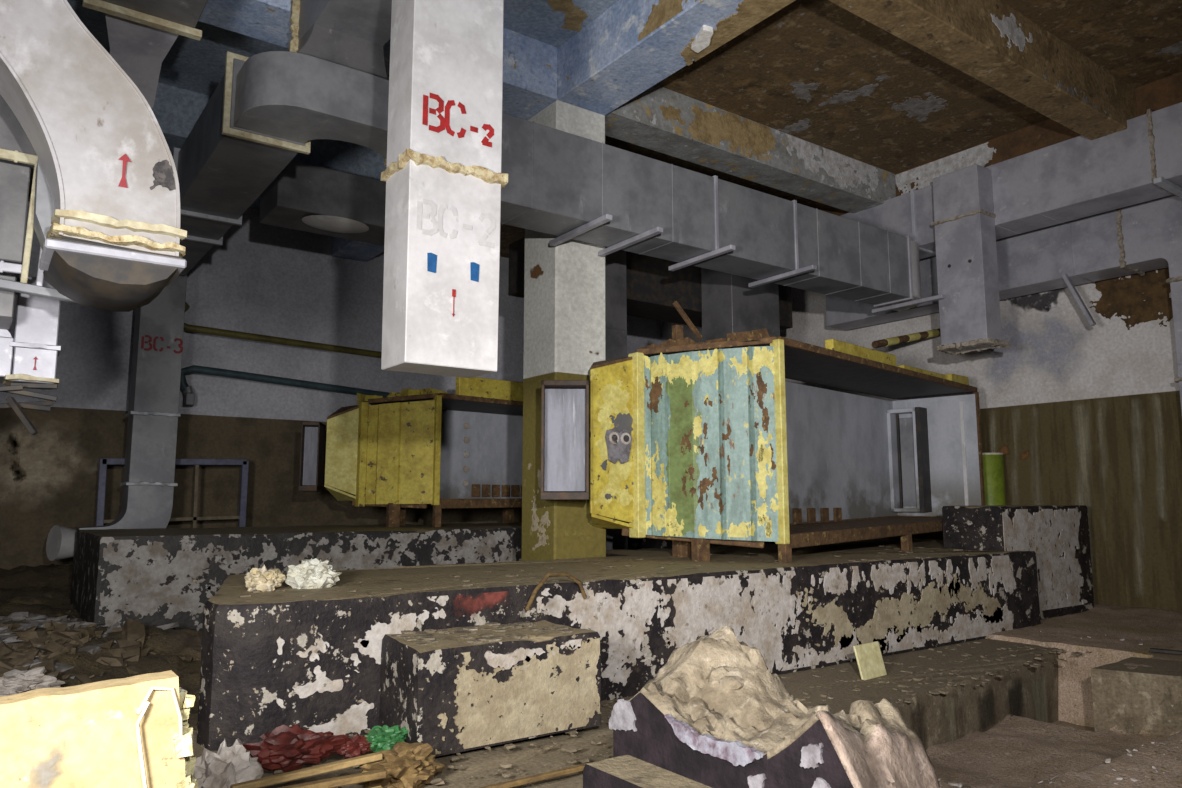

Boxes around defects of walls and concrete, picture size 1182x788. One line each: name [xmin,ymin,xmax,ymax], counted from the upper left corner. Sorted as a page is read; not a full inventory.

peeling [547,0,588,32]
peeling [638,0,697,41]
spalling [681,0,795,66]
peeling [1089,267,1173,330]
peeling [276,595,449,708]
peeling [435,509,1087,755]
peeling [303,701,374,735]
peeling [664,714,766,788]
peeling [800,743,831,788]
peeling [1087,732,1182,785]